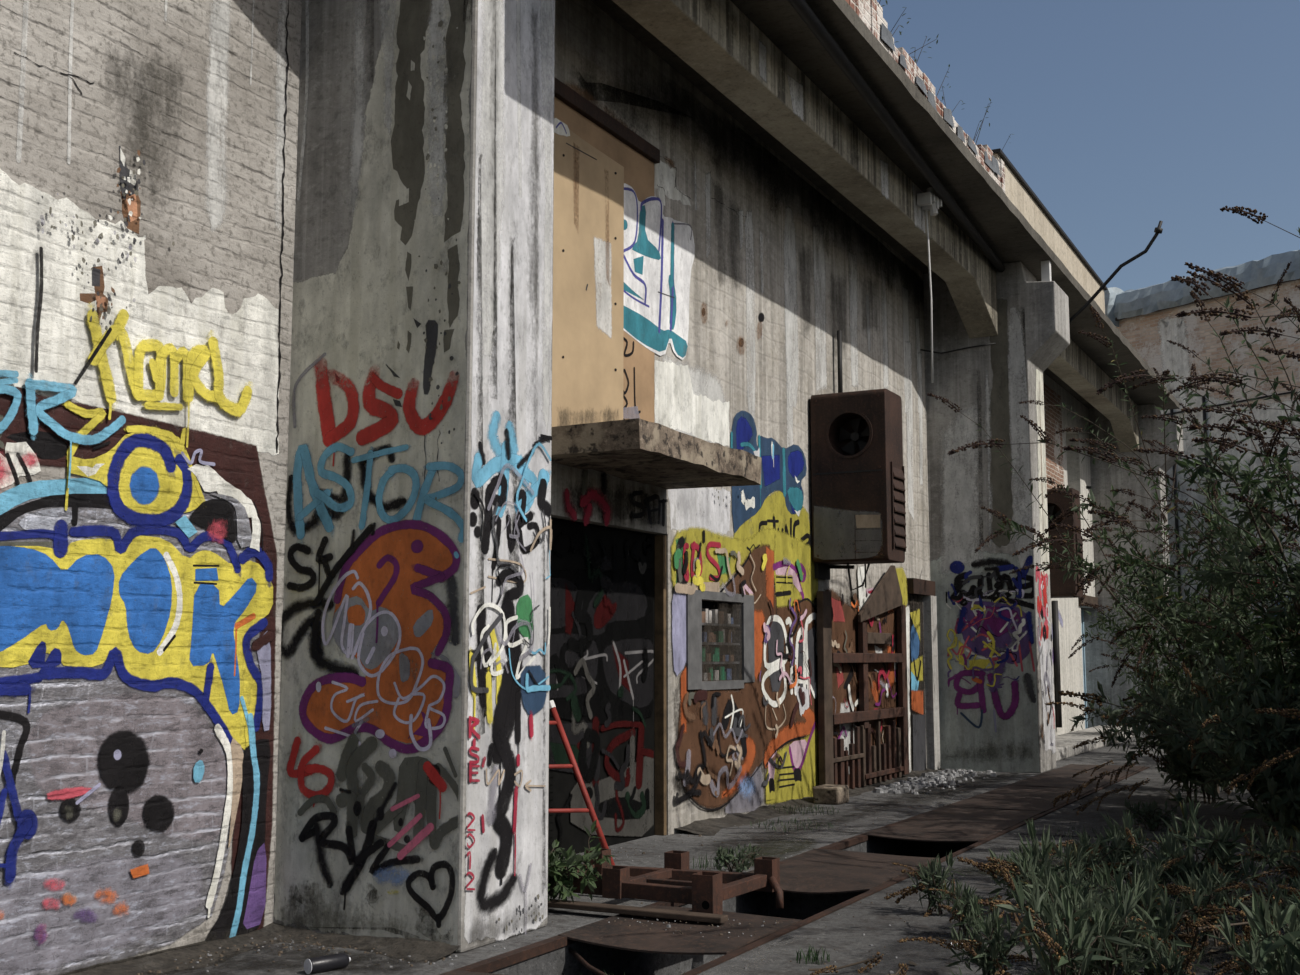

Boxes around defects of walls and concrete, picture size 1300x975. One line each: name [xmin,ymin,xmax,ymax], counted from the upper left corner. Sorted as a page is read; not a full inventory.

spalling [80,266,108,320]
spalling [119,146,141,234]
peeling [391,0,469,394]
water stain [580,74,925,519]